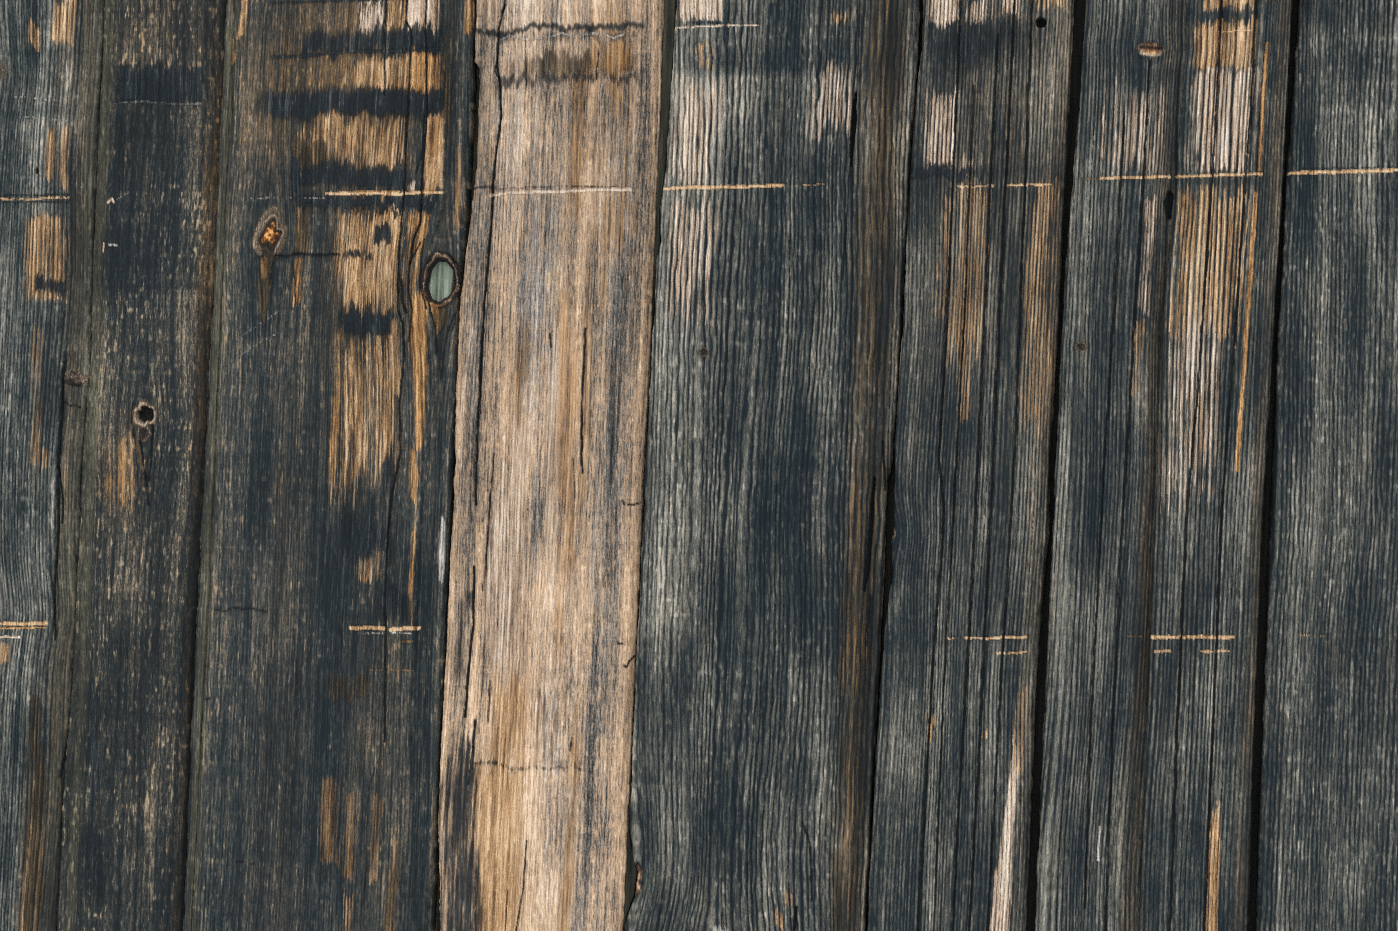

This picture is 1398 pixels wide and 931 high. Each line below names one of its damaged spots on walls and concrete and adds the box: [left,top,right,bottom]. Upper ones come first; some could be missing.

crack [361,0,527,931]
crack [549,328,587,499]
crack [863,441,887,647]